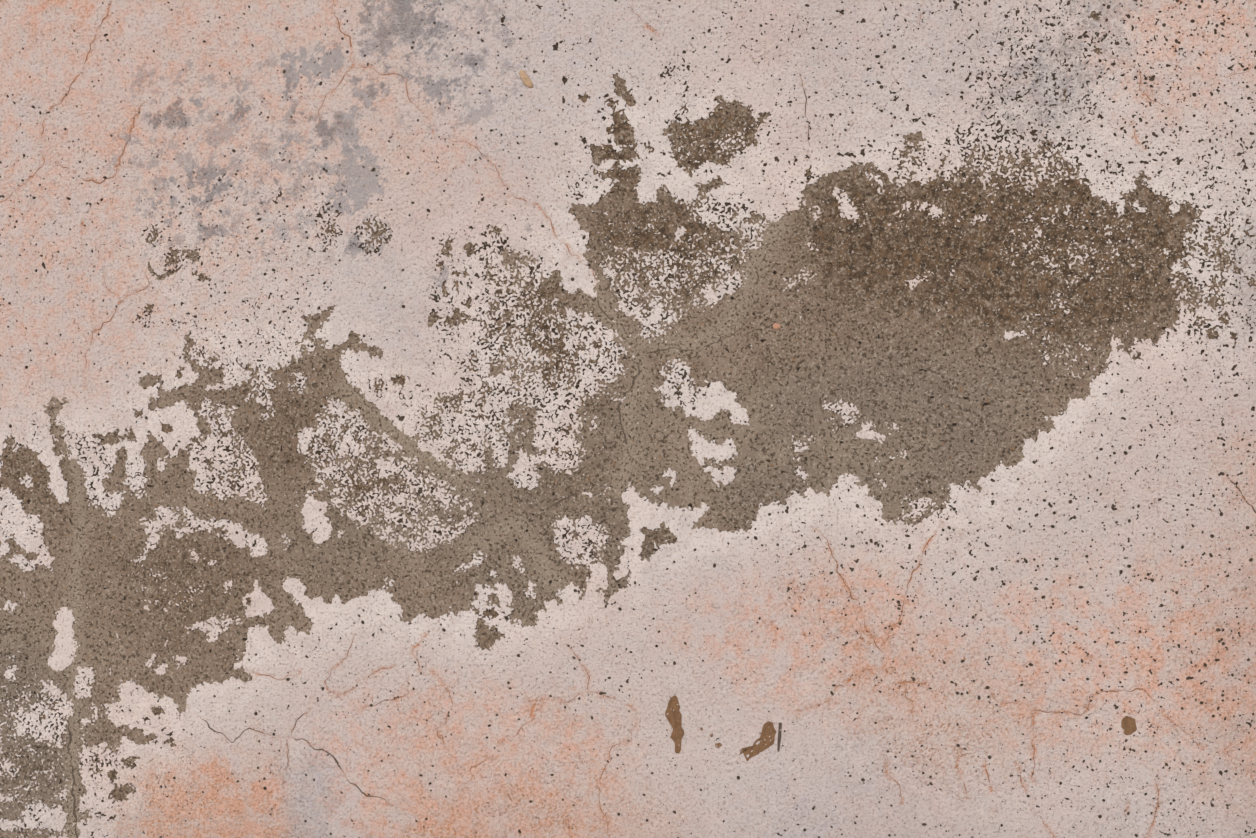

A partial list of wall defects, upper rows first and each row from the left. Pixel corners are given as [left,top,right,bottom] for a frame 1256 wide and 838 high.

peeling [613,73,637,107]
peeling [662,95,772,178]
peeling [899,131,926,166]
peeling [148,247,212,282]
peeling [430,242,490,302]
peeling [444,307,472,328]
peeling [92,428,137,446]
peeling [638,521,677,562]
peeling [473,592,506,651]
spalling [665,696,684,754]
spalling [739,721,776,761]
peeling [107,767,136,802]